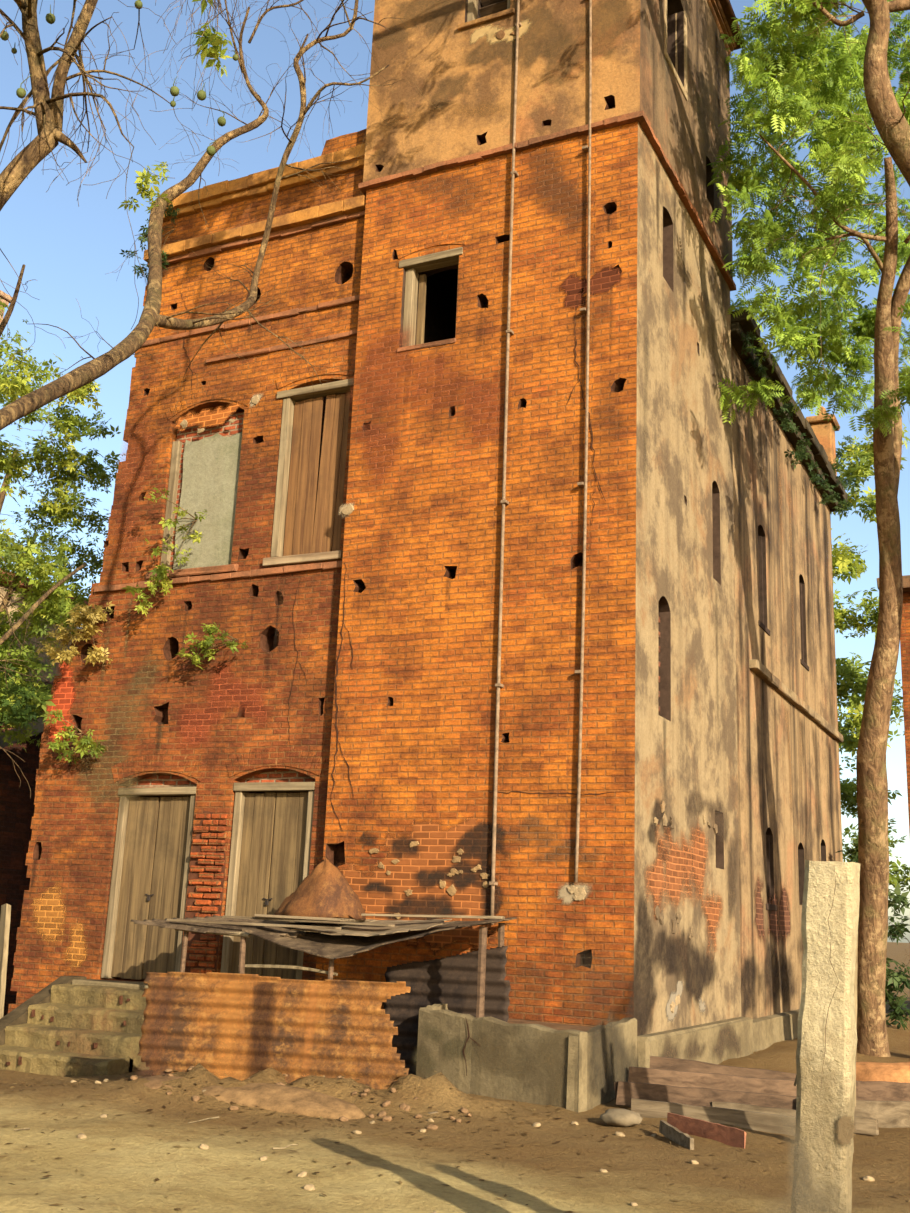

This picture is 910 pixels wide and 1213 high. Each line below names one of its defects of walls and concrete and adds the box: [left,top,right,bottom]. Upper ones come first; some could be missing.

peeling [175,395,262,434]
crack [288,562,354,831]
water stain [740,597,775,704]
water stain [808,573,829,633]
water stain [805,741,835,861]
spalling [342,818,499,956]
peeling [559,884,588,903]
spalling [647,800,722,948]
corrosion [216,980,240,1079]
corrosion [250,982,274,1075]
crack [462,1017,481,1076]